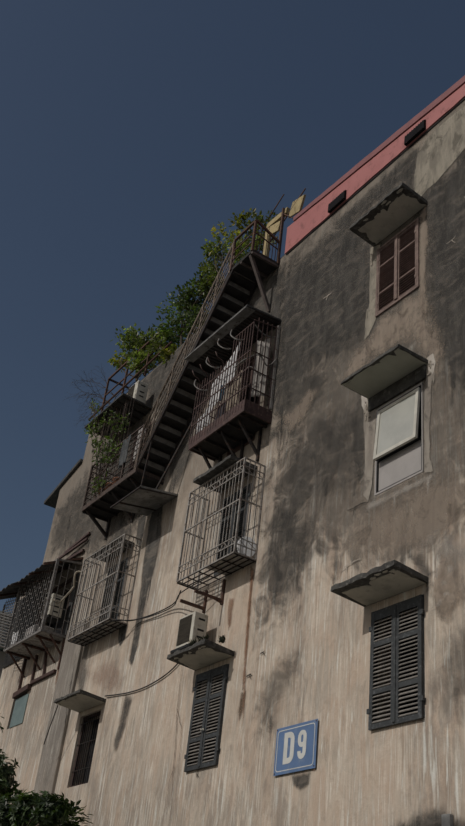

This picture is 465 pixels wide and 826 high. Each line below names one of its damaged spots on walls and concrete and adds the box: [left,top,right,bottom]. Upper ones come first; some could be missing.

peeling [342,106,465,508]
damp [414,154,465,389]
damp [52,418,163,664]
damp [267,417,364,588]
peeling [342,569,426,606]